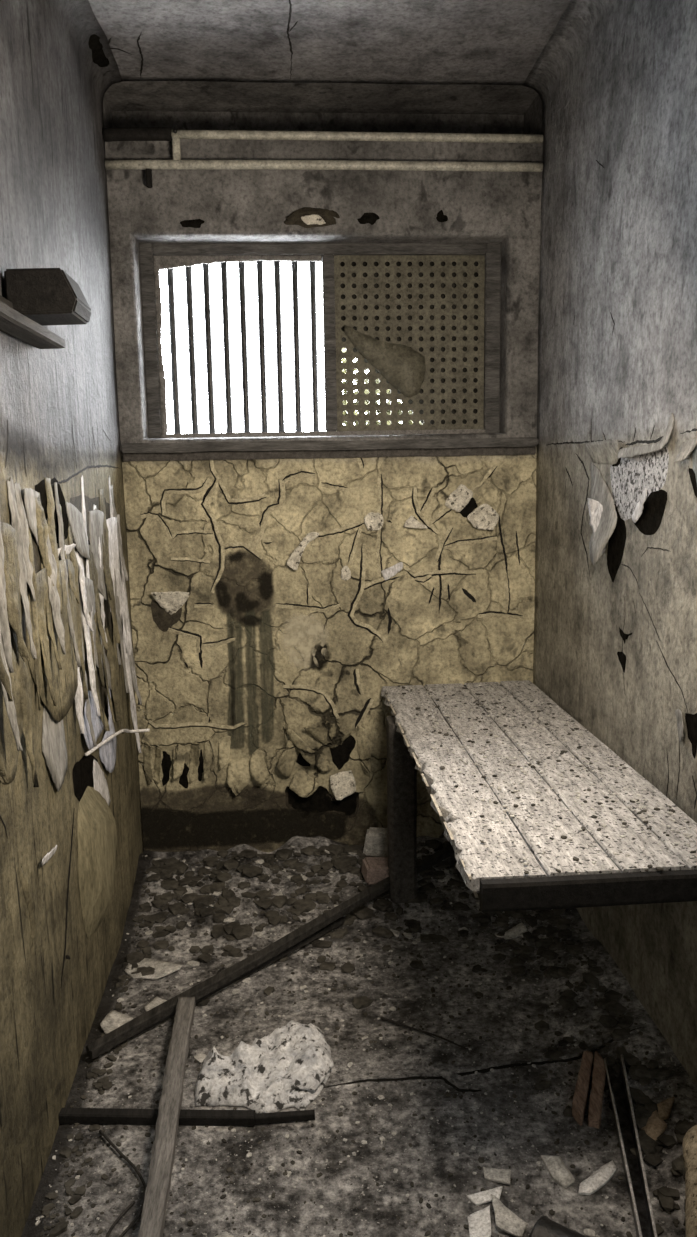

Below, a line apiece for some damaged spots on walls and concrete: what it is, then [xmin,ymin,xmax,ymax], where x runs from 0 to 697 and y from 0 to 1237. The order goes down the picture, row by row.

peeling [586,413,697,583]
crack [140,458,523,668]
peeling [0,475,372,817]
spalling [617,627,632,673]
crack [148,716,247,730]
damp [227,610,330,755]
crack [283,669,374,728]
spalling [675,709,697,759]
peeling [42,845,57,866]